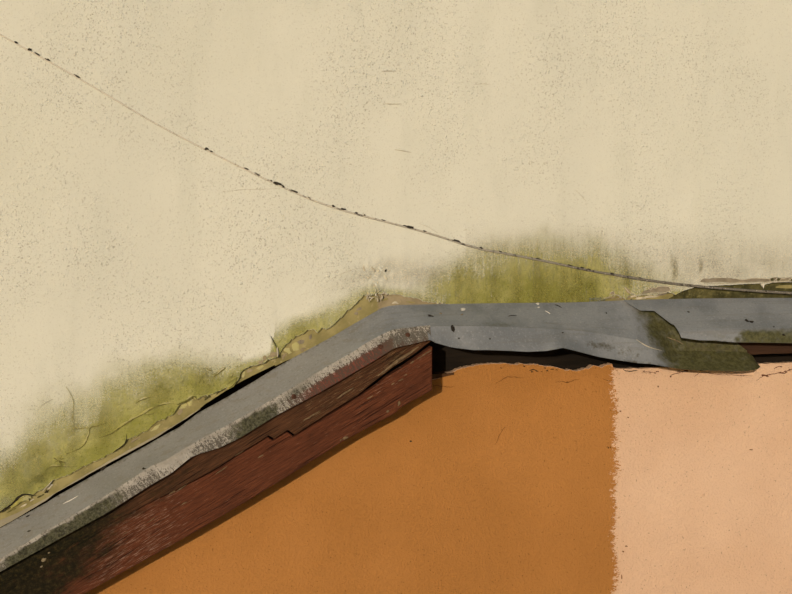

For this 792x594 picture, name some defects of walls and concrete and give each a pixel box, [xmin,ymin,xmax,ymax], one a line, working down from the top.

spalling [604,277,792,300]
crack [206,366,237,389]
crack [42,387,198,471]